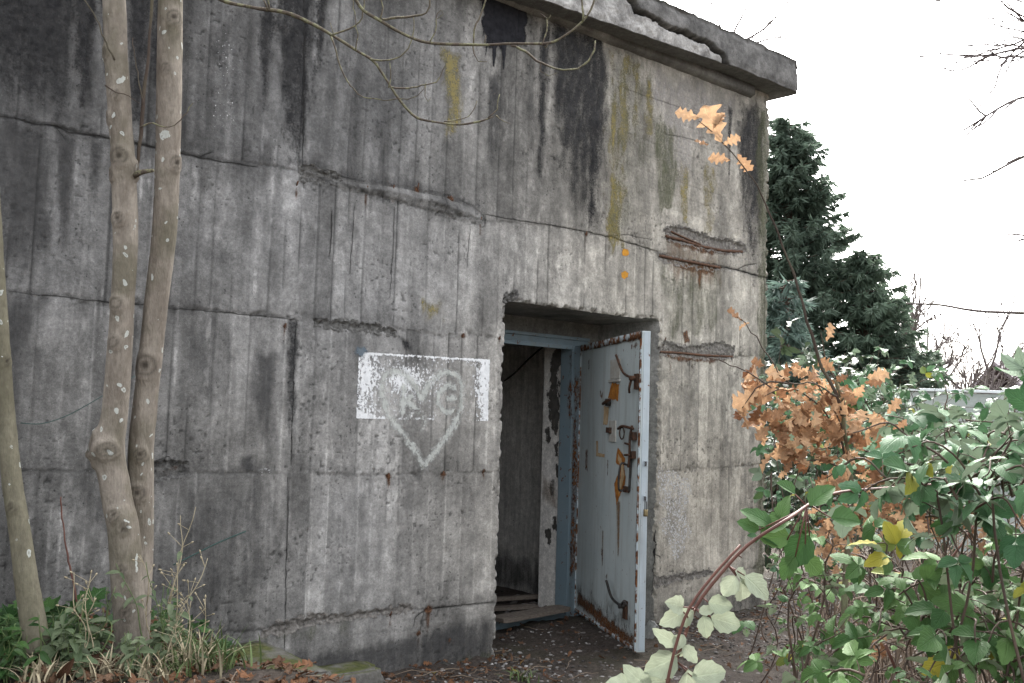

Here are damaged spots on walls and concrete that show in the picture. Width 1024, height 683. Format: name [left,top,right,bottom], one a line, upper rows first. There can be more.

crack [0,116,107,139]
damp [128,0,158,121]
crack [180,152,256,167]
damp [258,0,327,163]
damp [480,0,528,147]
damp [528,24,641,250]
spalling [657,206,756,296]
peeling [545,348,561,497]
rust [568,377,588,576]
rust [600,382,619,401]
spalling [657,340,735,362]
rust [577,593,634,650]